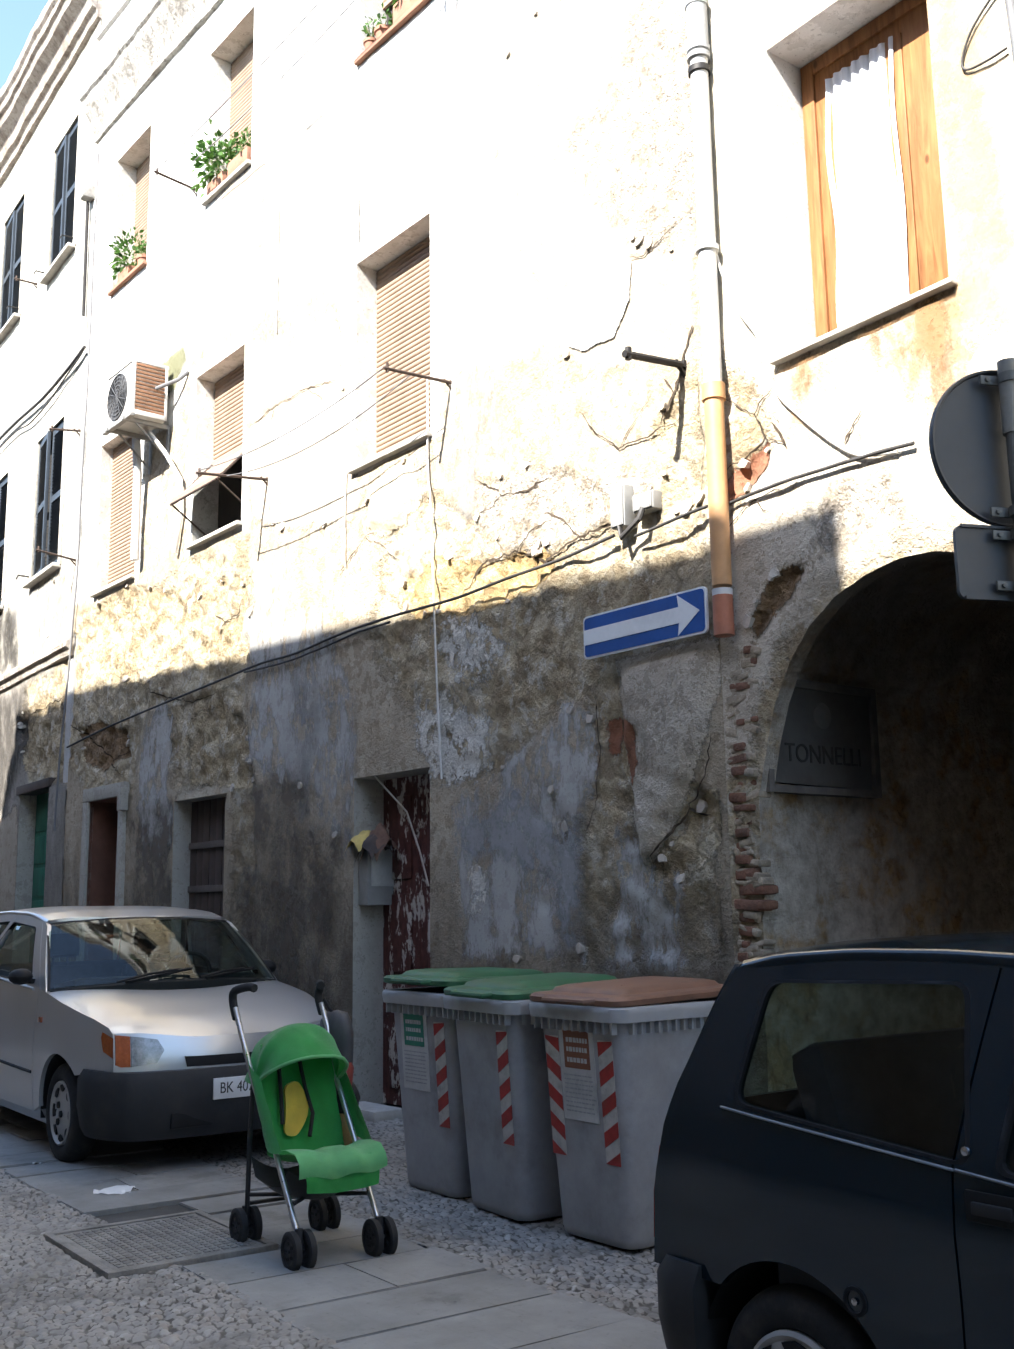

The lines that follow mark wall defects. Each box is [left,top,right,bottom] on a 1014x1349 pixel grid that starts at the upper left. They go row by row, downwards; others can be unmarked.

flaking render [191,161,269,291]
flaking render [398,0,705,623]
crack [583,325,693,449]
crack [463,472,611,592]
flaking render [727,442,771,502]
peeling [17,553,356,851]
flaking render [609,564,805,971]